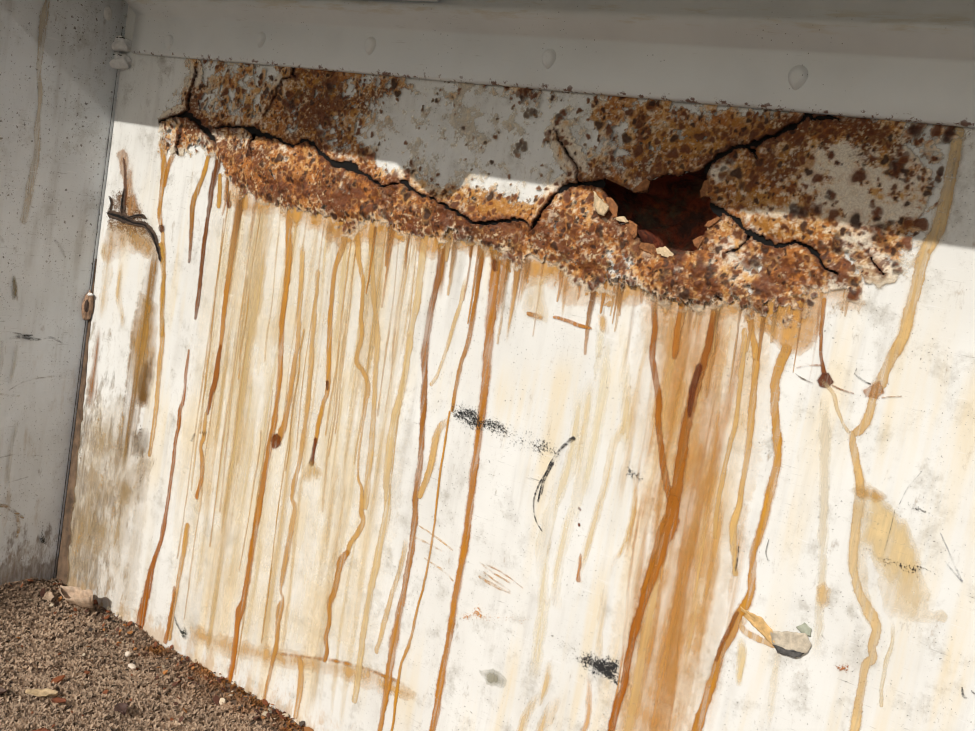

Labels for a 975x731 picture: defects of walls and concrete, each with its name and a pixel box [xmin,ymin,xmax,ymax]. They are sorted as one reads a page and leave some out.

crack [89,26,161,290]
crack [159,69,606,228]
spalling [604,169,719,259]
crack [704,113,839,174]
crack [710,203,838,275]
crack [53,321,86,578]
corrosion [89,341,98,397]
corrosion [106,115,965,731]